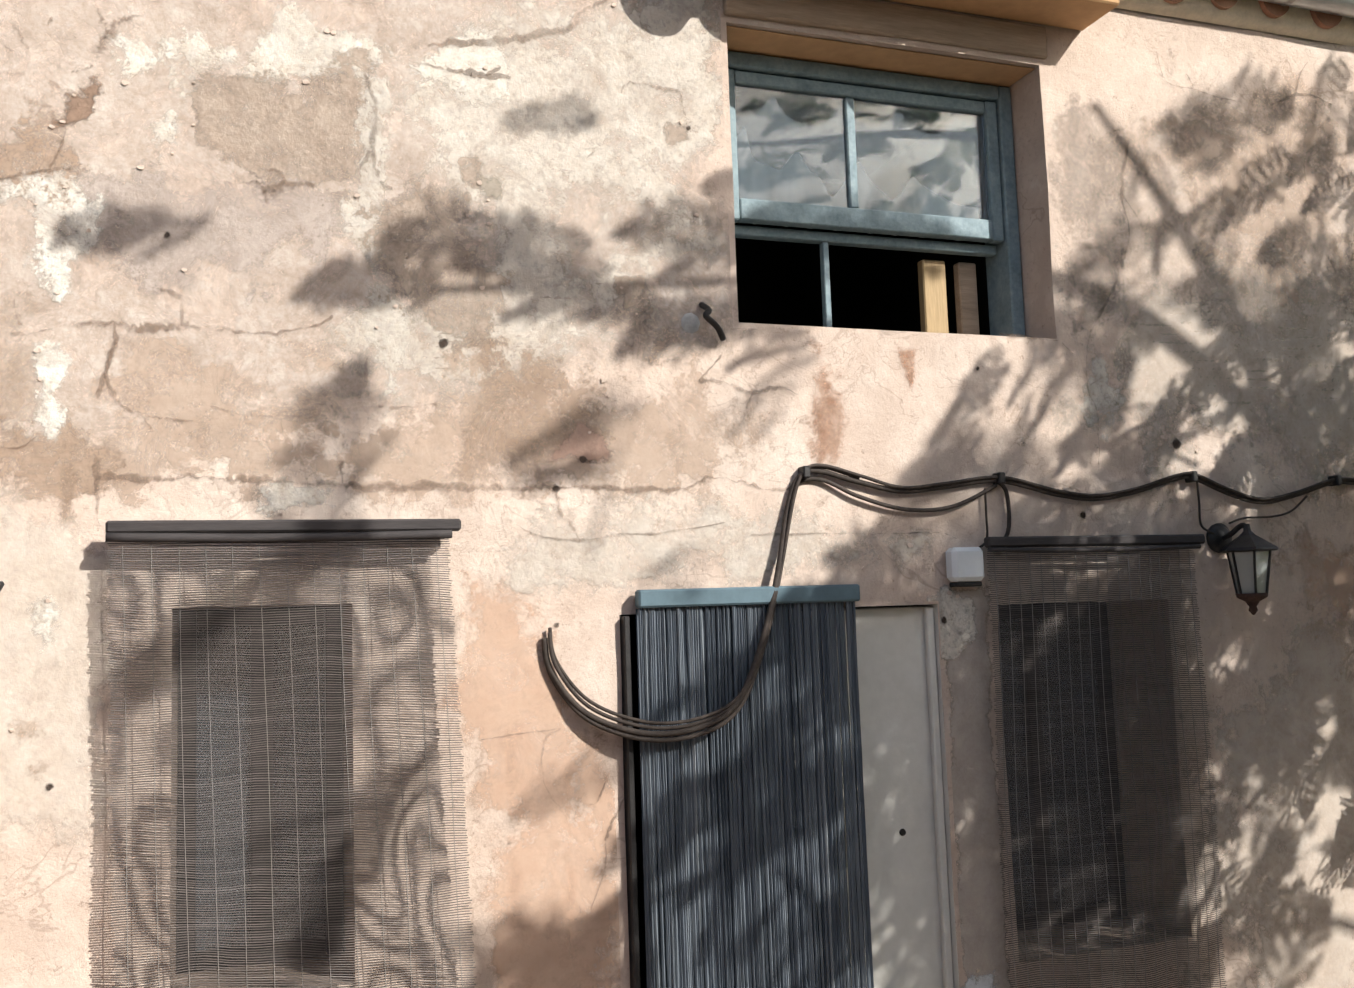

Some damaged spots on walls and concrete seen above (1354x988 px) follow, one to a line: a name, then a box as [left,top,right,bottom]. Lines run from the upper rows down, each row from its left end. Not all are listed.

crack [89,322,170,387]
flaking render [0,0,731,470]
flaking render [0,488,122,845]